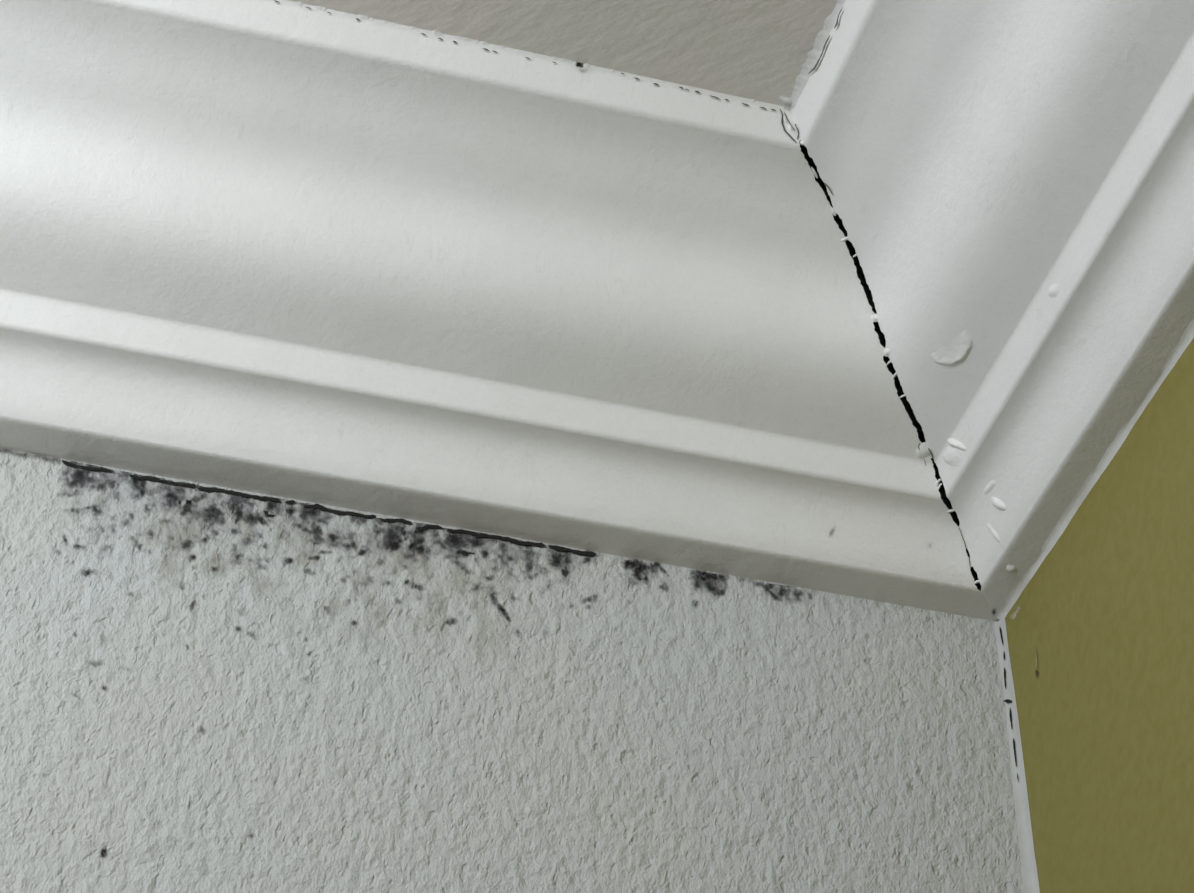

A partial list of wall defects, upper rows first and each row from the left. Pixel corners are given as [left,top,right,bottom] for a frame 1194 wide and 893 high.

crack [808,7,843,74]
crack [621,73,981,591]
water stain [64,461,266,558]
crack [62,460,629,560]
water stain [268,497,542,588]
water stain [549,544,592,576]
water stain [625,559,668,589]
water stain [694,570,726,594]